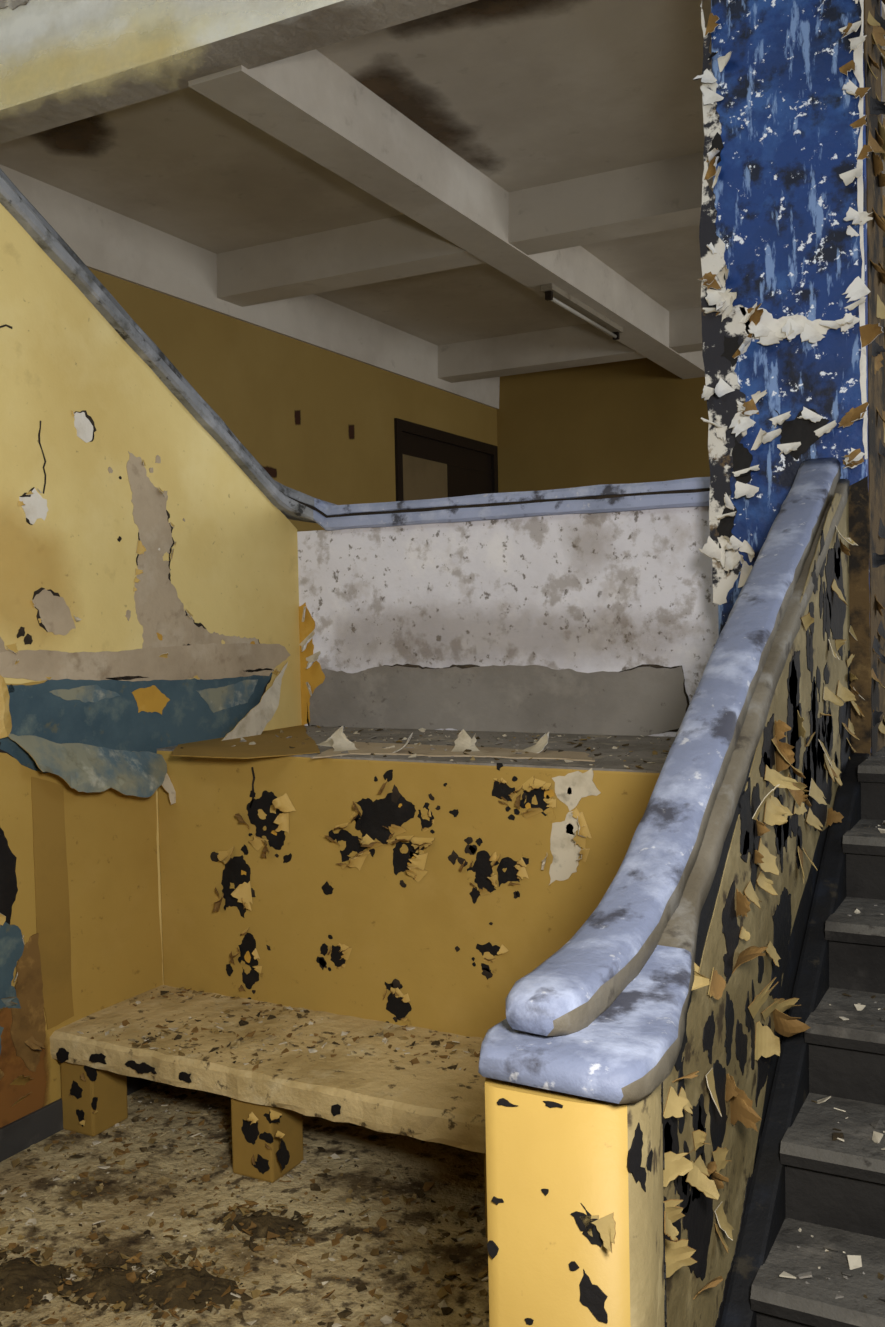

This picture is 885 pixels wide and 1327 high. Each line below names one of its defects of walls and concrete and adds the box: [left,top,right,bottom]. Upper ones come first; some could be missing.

crack [0,0,29,10]
damp [37,115,108,154]
damp [356,69,490,167]
peeling [71,410,97,443]
peeling [627,0,885,1327]
peeling [0,451,690,1107]
crack [0,827,18,926]
peeling [69,1053,107,1127]
peeling [241,1109,290,1174]
peeling [487,1240,499,1259]
peeling [571,1203,616,1253]
peeling [569,1261,608,1323]